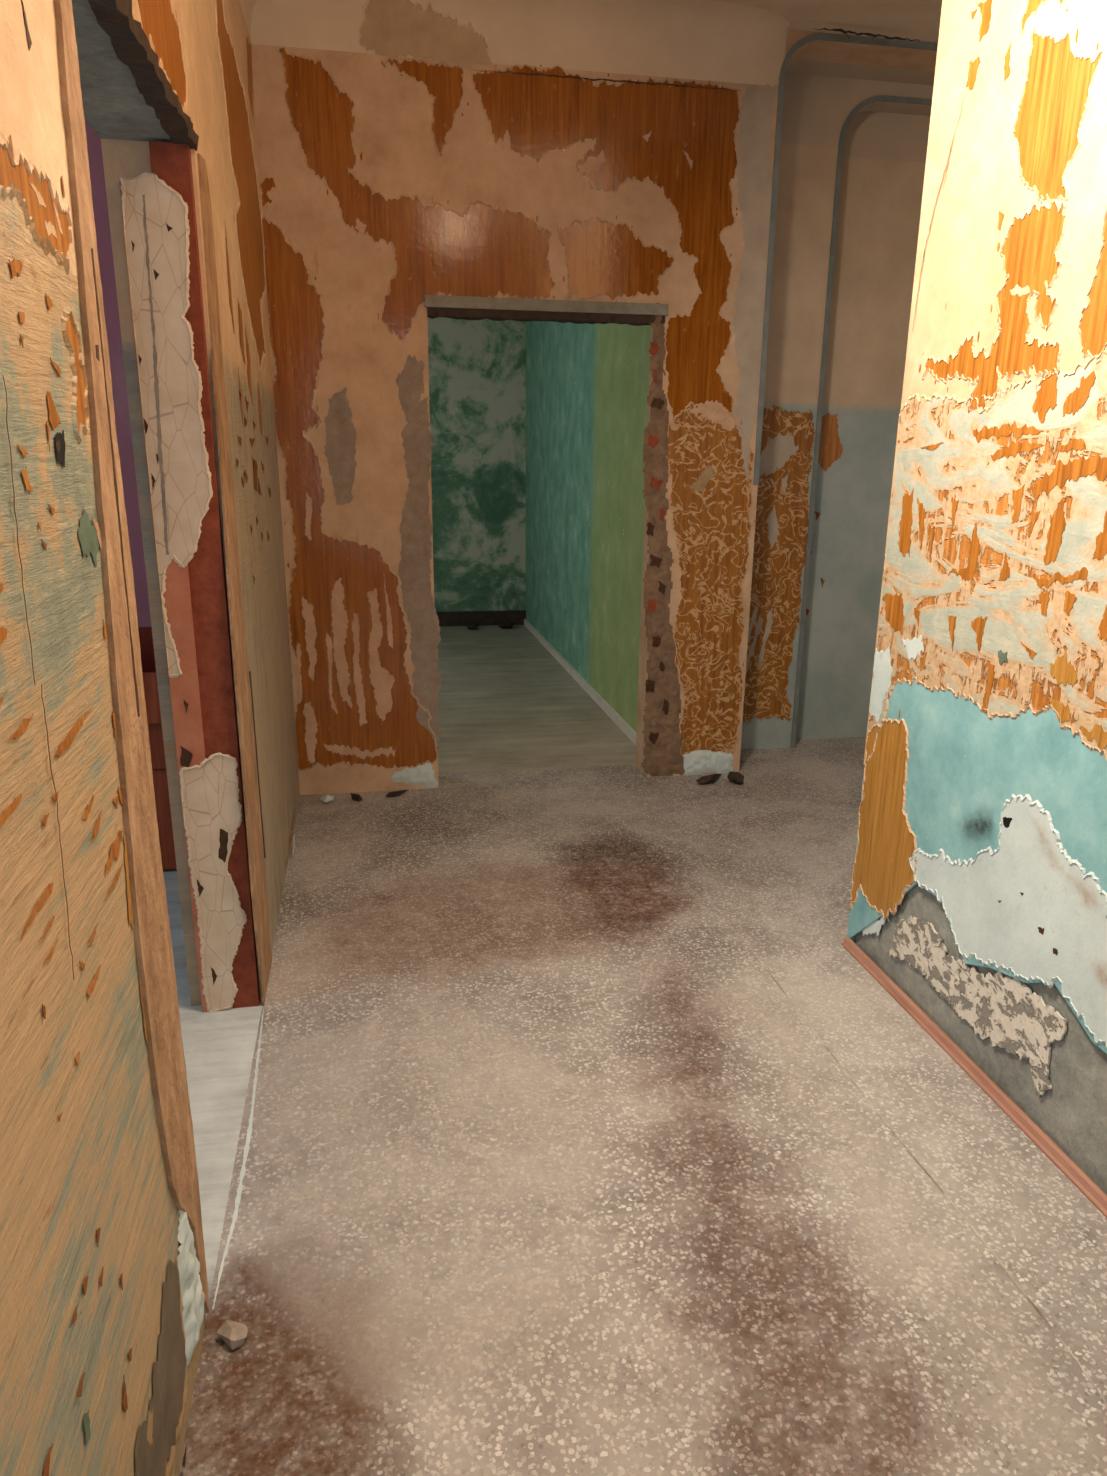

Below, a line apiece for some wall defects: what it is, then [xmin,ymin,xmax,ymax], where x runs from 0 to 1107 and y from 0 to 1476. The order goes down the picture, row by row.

peeling [21,0,32,51]
peeling [135,0,188,113]
peeling [0,132,73,278]
peeling [919,0,1107,414]
peeling [120,172,213,678]
peeling [215,0,438,771]
peeling [277,0,844,777]
peeling [998,650,1008,665]
peeling [79,787,149,1046]
peeling [179,746,247,1012]
flaking render [849,709,1107,1195]
flaking render [135,1259,188,1476]